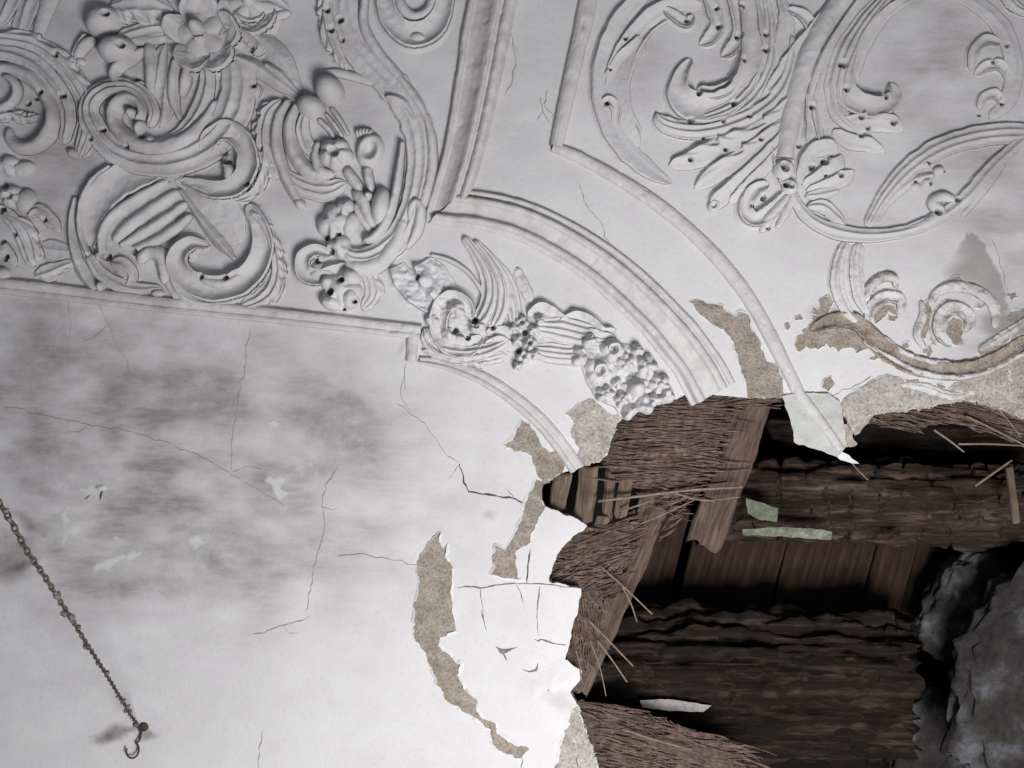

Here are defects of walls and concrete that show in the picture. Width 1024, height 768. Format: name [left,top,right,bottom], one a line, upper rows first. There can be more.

crack [0,336,283,505]
crack [401,363,523,503]
flaking render [564,398,622,466]
flaking render [689,299,787,398]
flaking render [784,295,881,361]
flaking render [841,356,1024,430]
flaking render [946,316,964,347]
crack [257,470,409,634]
flaking render [488,418,565,582]
flaking render [411,530,529,760]
crack [460,554,577,672]
flaking render [554,706,599,768]